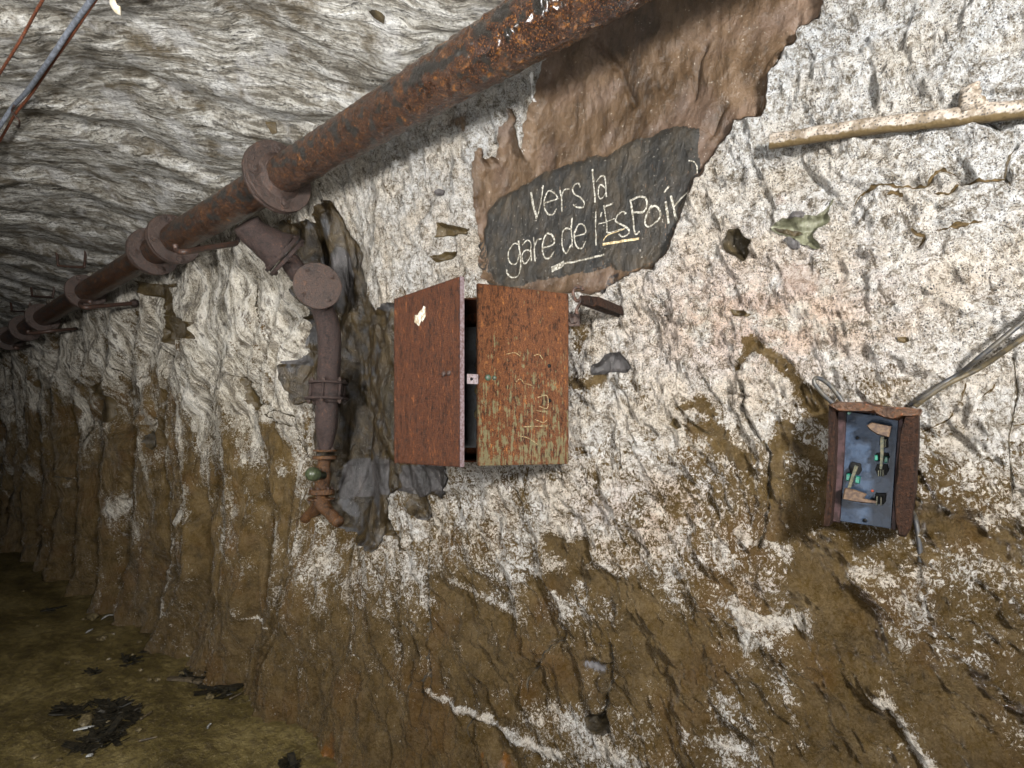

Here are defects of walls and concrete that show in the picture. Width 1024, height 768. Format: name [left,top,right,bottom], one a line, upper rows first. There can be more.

peeling [273,200,448,552]
spalling [430,251,457,263]
peeling [435,0,823,294]